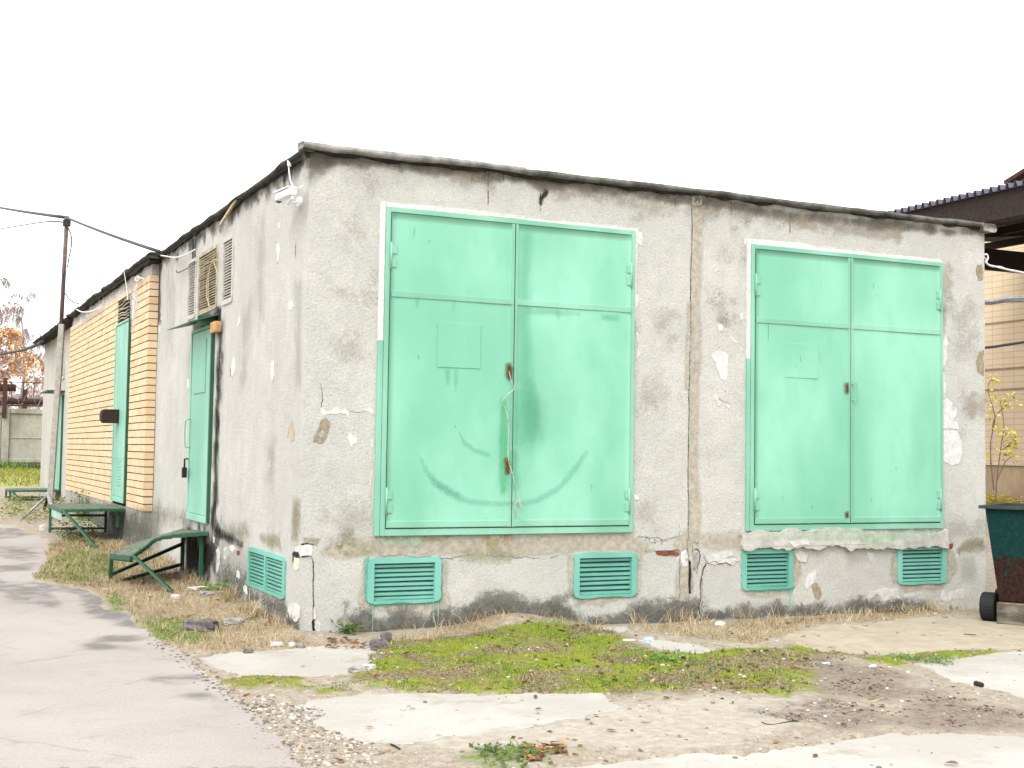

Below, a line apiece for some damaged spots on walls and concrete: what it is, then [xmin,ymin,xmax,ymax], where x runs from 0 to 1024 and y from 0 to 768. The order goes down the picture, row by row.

spalling [313,384,374,444]
crack [637,195,694,601]
flaking render [711,324,742,410]
flaking render [943,332,962,465]
leakage [186,322,300,630]
leakage [338,590,929,633]
flaking render [644,527,953,620]